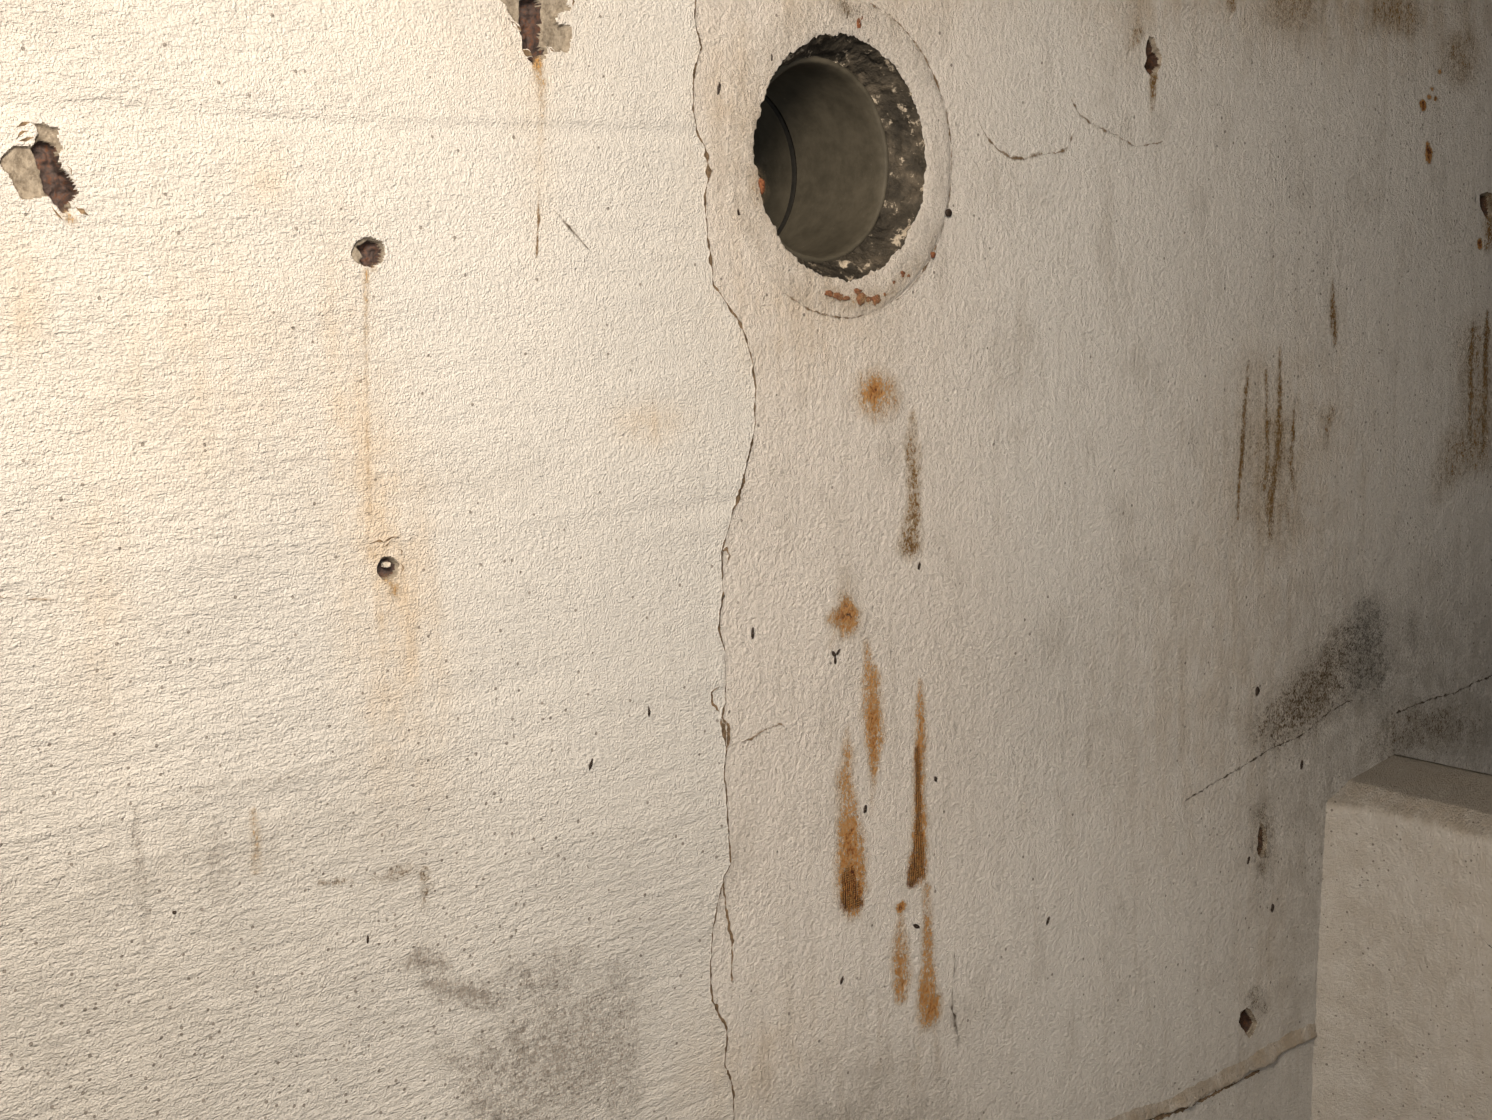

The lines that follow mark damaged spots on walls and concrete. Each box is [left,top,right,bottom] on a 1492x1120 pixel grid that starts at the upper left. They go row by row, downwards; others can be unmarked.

spalling [0,107,93,230]
spalling [488,0,582,86]
crack [872,4,1161,204]
crack [689,0,782,1120]
rust [899,416,921,556]
water stain [1253,601,1388,749]
rust [836,648,884,918]
rust [894,686,941,1027]
crack [1187,701,1349,800]
water stain [406,949,504,1009]
water stain [450,953,635,1120]
spalling [1234,987,1267,1046]